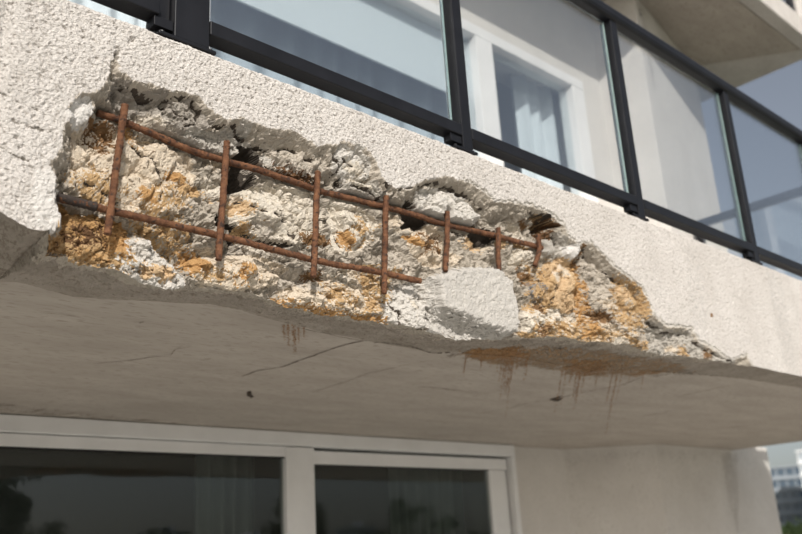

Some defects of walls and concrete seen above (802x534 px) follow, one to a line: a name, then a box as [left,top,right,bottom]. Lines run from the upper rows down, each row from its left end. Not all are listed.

rust [271,159,314,192]
rust [45,115,261,284]
rust [297,231,332,249]
rust [351,206,381,249]
spalling [30,59,754,366]
rust [416,231,443,257]
rust [453,235,483,255]
rust [195,259,263,289]
rust [267,264,402,325]
crack [244,289,450,392]
rust [459,214,690,434]